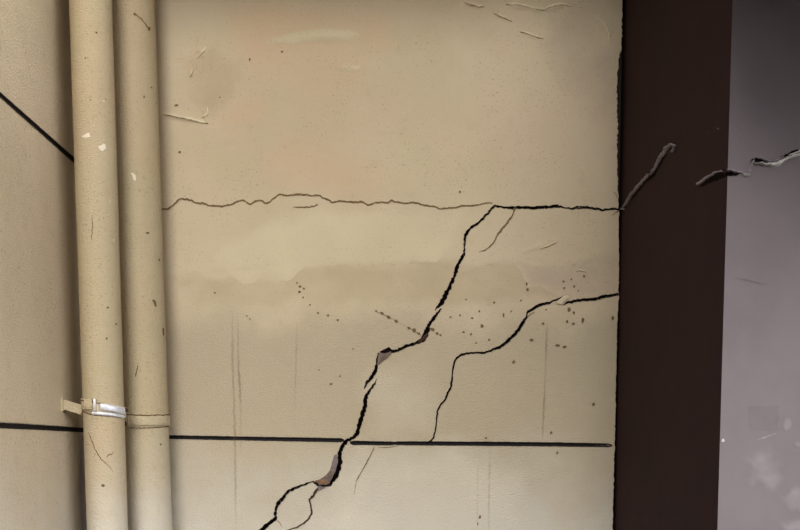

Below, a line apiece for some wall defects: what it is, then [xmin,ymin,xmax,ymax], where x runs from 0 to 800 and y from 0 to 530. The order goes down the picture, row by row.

crack [696,149,800,187]
crack [162,143,676,530]
spalling [377,347,392,365]
spalling [315,454,338,491]